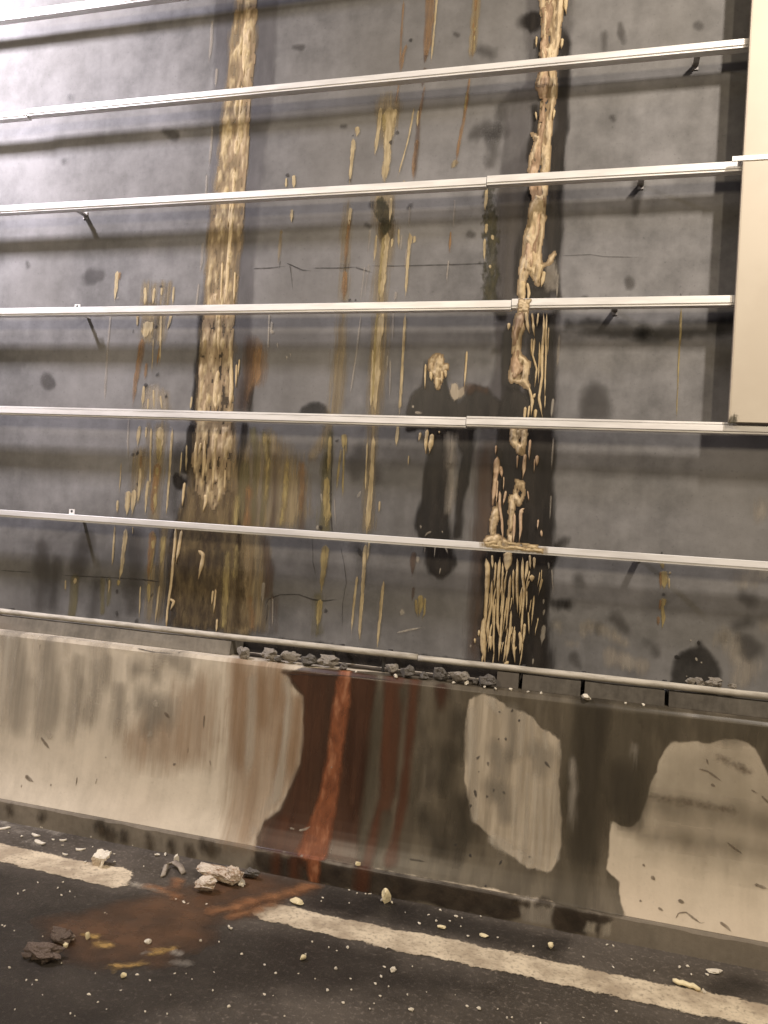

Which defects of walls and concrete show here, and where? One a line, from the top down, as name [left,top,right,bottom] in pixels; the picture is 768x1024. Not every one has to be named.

damp [90,271,120,299]
damp [43,375,54,388]
damp [98,0,768,938]
corrosion [243,669,420,866]
damp [95,822,126,842]
damp [57,940,89,960]
damp [0,985,98,1024]